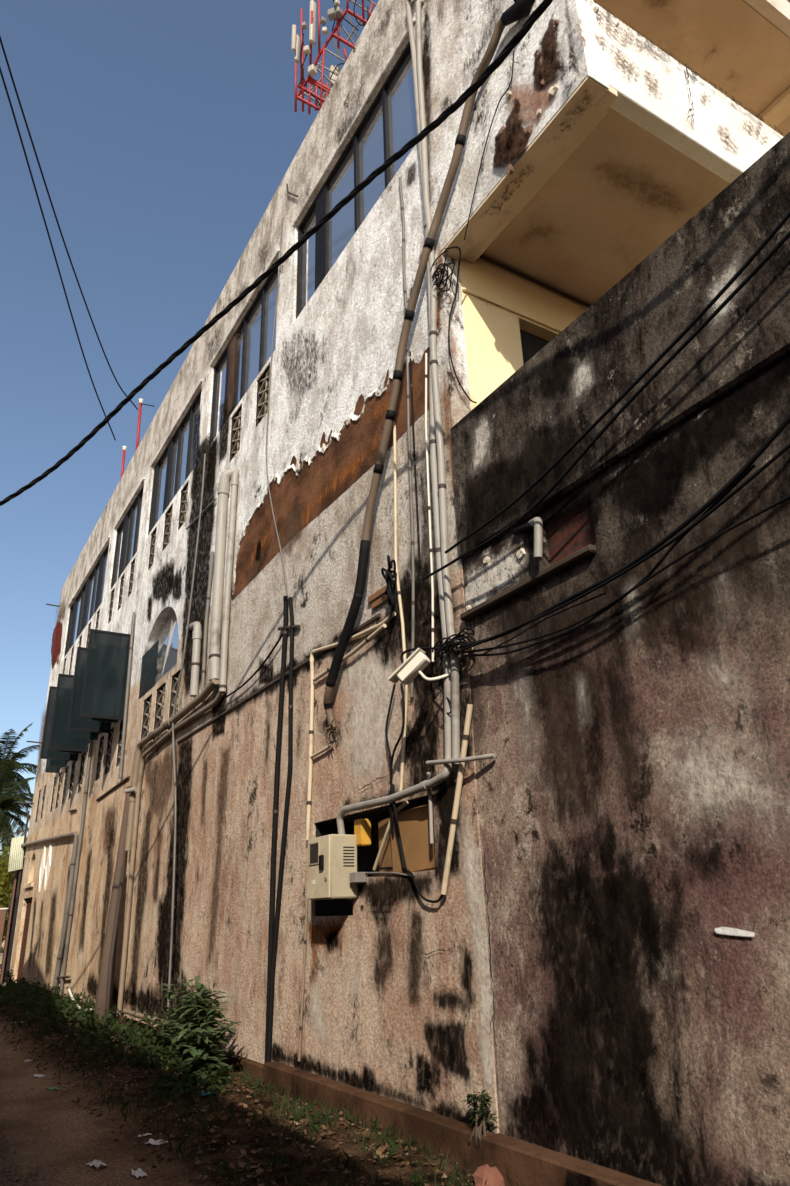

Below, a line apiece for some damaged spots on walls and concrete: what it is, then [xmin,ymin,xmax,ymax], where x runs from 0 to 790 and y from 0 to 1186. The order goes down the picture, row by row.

mould [590,1,782,135]
crack [685,64,694,131]
damp [711,267,737,315]
damp [182,336,238,693]
peeling [231,347,430,600]
damp [460,353,790,663]
damp [212,632,356,760]
damp [112,730,229,1019]
damp [271,464,787,1186]